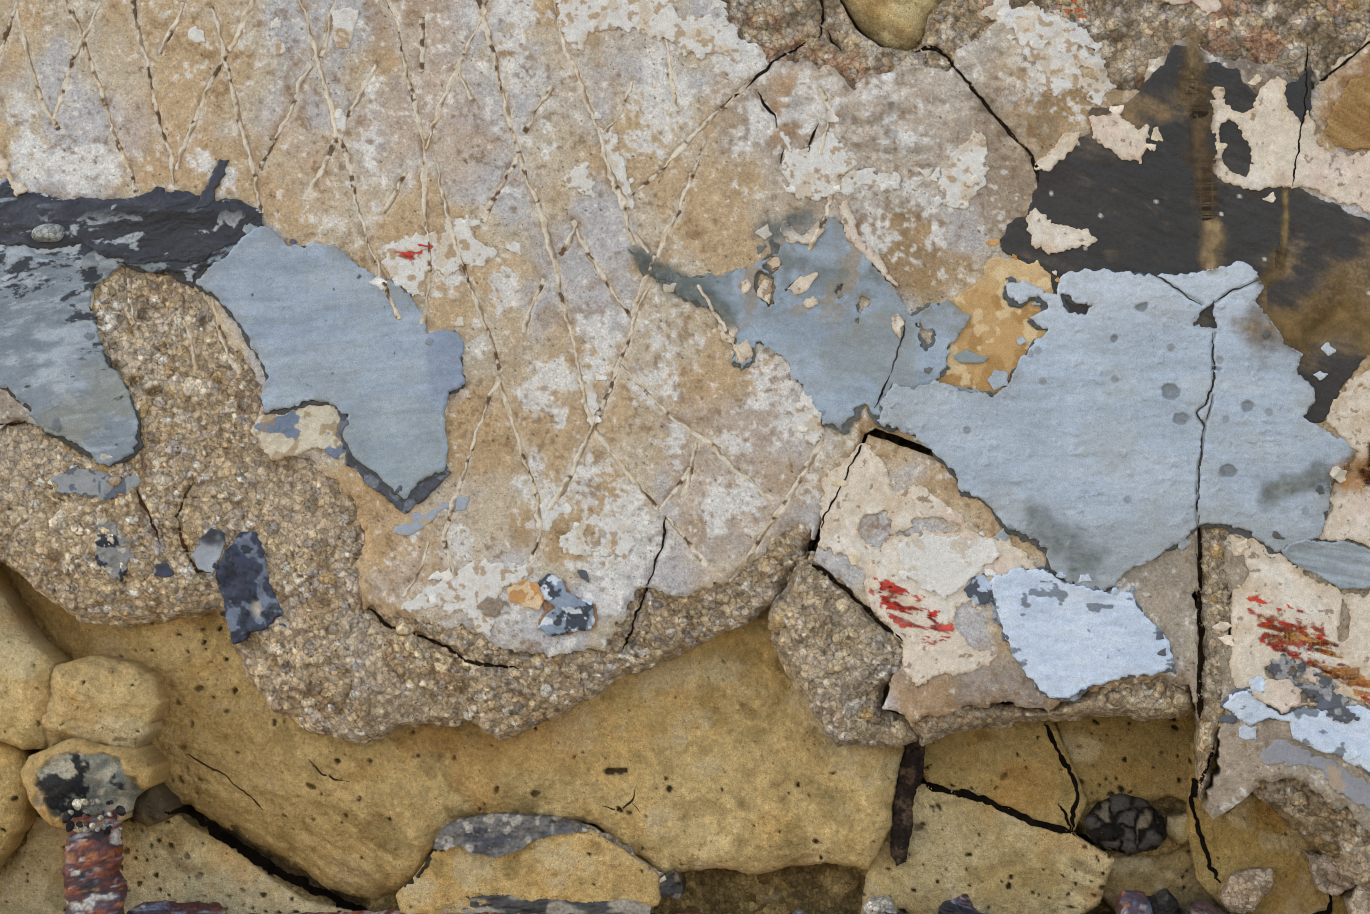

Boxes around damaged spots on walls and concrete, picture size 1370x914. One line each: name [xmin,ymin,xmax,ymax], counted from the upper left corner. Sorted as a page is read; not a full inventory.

peeling [188,26,205,43]
peeling [271,17,285,56]
peeling [331,8,359,48]
peeling [329,97,347,139]
crack [915,45,1039,183]
crack [1292,41,1370,186]
crack [0,0,905,669]
damp [1246,277,1370,344]
spalling [0,153,812,744]
peeling [556,0,1370,810]
crack [922,723,1124,853]